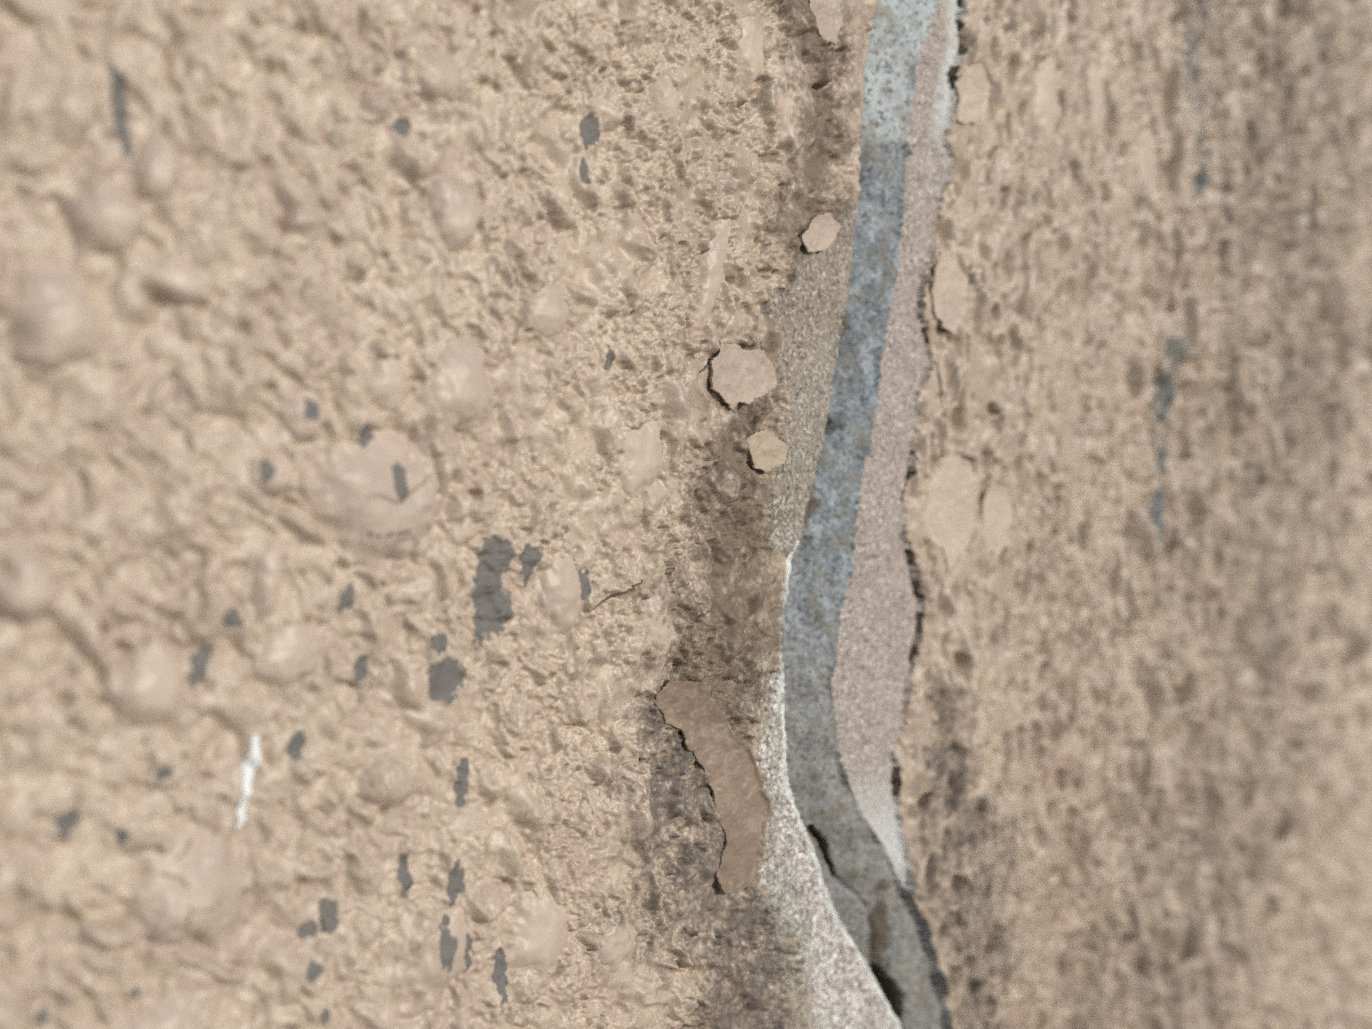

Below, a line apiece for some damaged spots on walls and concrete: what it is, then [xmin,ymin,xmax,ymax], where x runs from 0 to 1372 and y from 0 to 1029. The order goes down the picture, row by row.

peeling [808,0,843,46]
flaking render [709,192,861,558]
crack [775,0,953,1029]
flaking render [831,0,1014,897]
flaking render [654,670,897,1029]